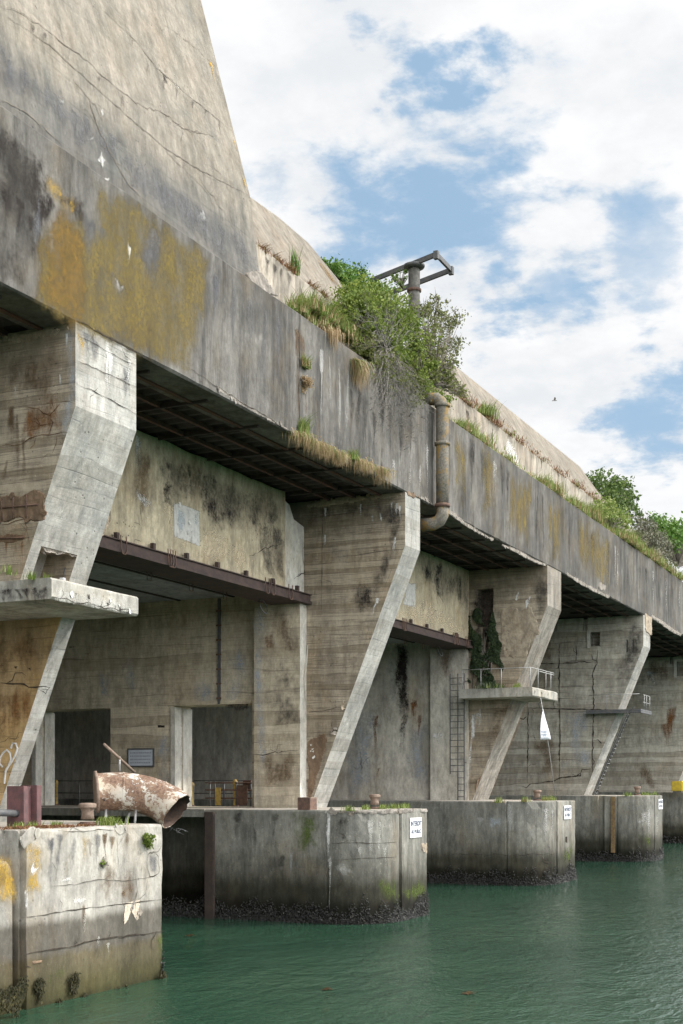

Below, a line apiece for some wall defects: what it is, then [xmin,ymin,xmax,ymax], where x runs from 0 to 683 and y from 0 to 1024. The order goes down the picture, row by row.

crack [0,2,248,226]
damp [0,135,52,243]
rust [9,401,54,436]
spalling [0,489,47,543]
peeling [174,502,200,546]
damp [136,435,283,576]
crack [4,672,50,694]
damp [396,647,408,730]
crack [520,645,612,788]
spalling [306,734,328,797]